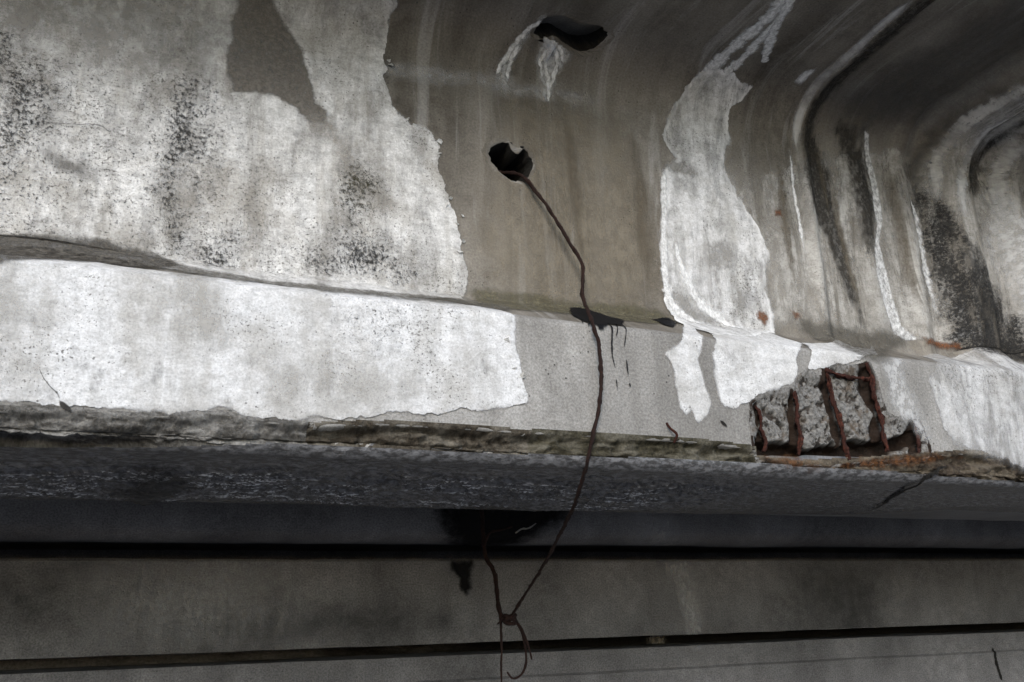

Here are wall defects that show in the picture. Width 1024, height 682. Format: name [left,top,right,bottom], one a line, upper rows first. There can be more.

leakage [0,0,509,350]
peeling [0,0,1024,482]
leakage [493,0,1024,387]
crack [868,466,947,511]